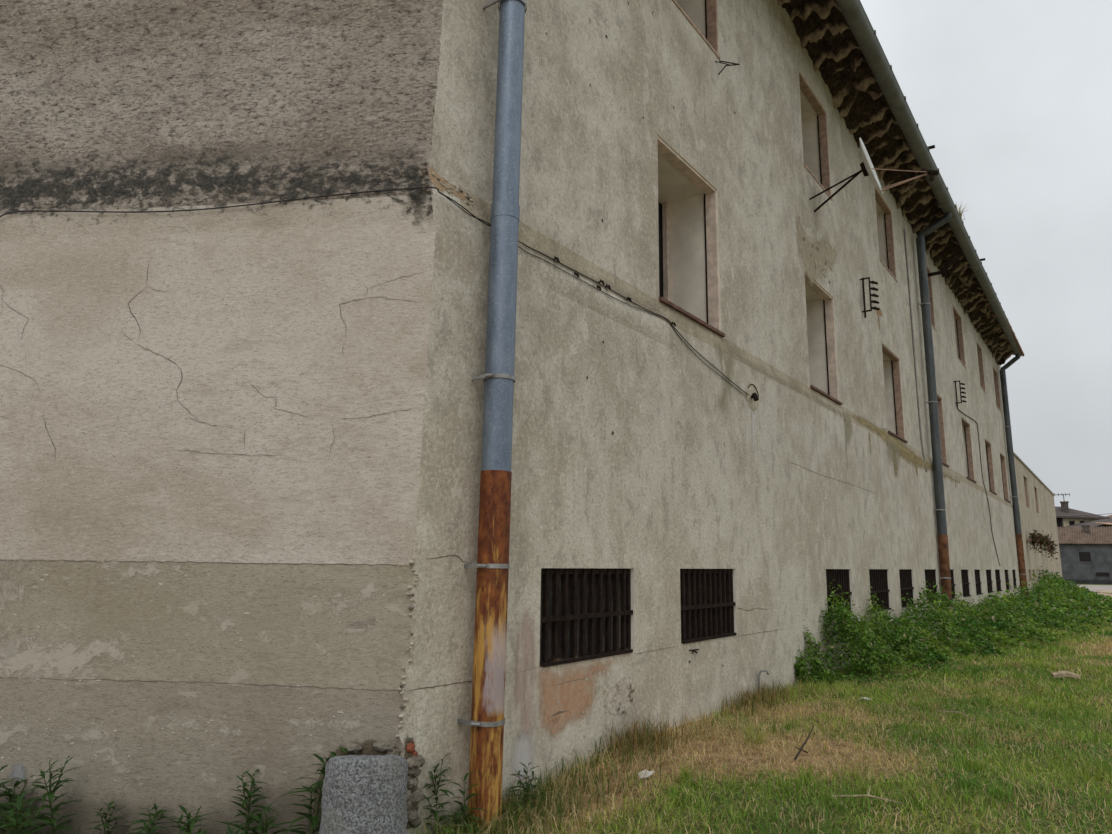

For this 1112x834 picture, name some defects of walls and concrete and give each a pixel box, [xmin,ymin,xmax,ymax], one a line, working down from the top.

leakage [0,149,433,222]
crack [124,259,214,426]
crack [178,386,307,456]
rust [937,534,953,610]
rust [467,470,512,834]
peeling [540,661,635,734]